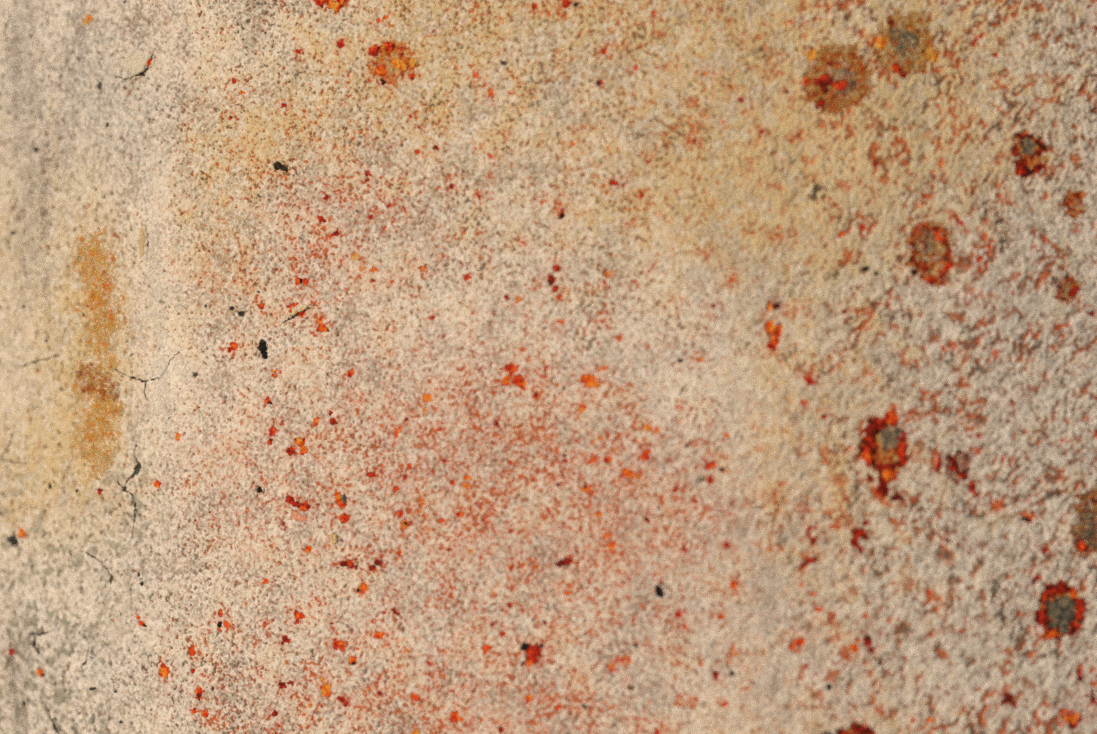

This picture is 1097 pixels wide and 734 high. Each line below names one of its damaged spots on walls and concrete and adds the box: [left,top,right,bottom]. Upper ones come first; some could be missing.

rust [367,40,419,88]
rust [802,9,940,117]
rust [1011,130,1049,179]
rust [906,215,964,286]
rust [68,227,127,495]
rust [499,363,539,398]
rust [857,406,910,501]
rust [333,489,349,523]
rust [332,556,383,594]
rust [1032,575,1087,641]
rust [278,677,349,708]
rust [836,722,875,734]